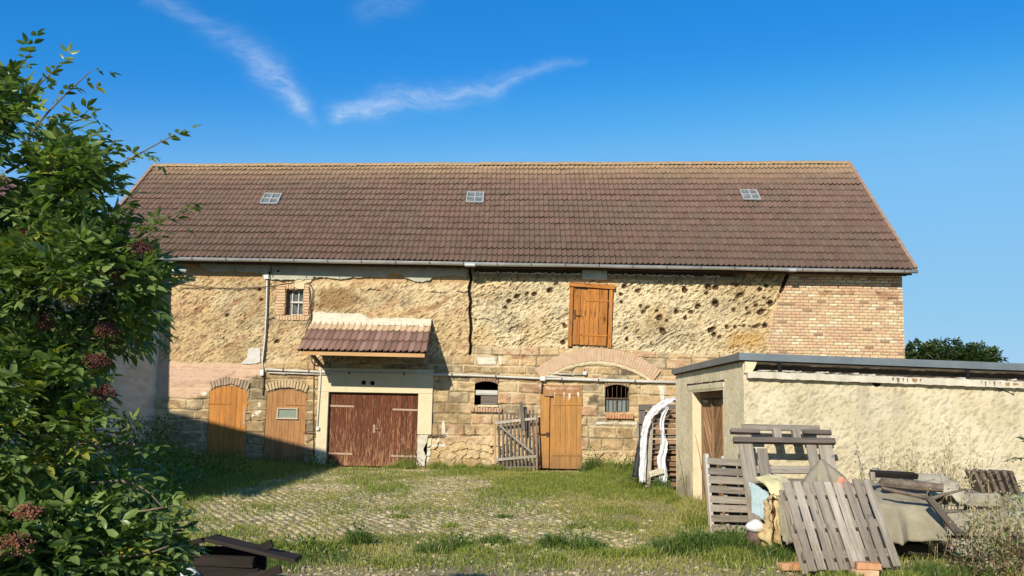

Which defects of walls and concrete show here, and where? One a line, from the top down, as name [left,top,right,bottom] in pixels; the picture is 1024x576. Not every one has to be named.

crack [427,269,493,356]
spalling [608,273,720,334]
spalling [708,283,775,339]
crack [774,274,789,302]